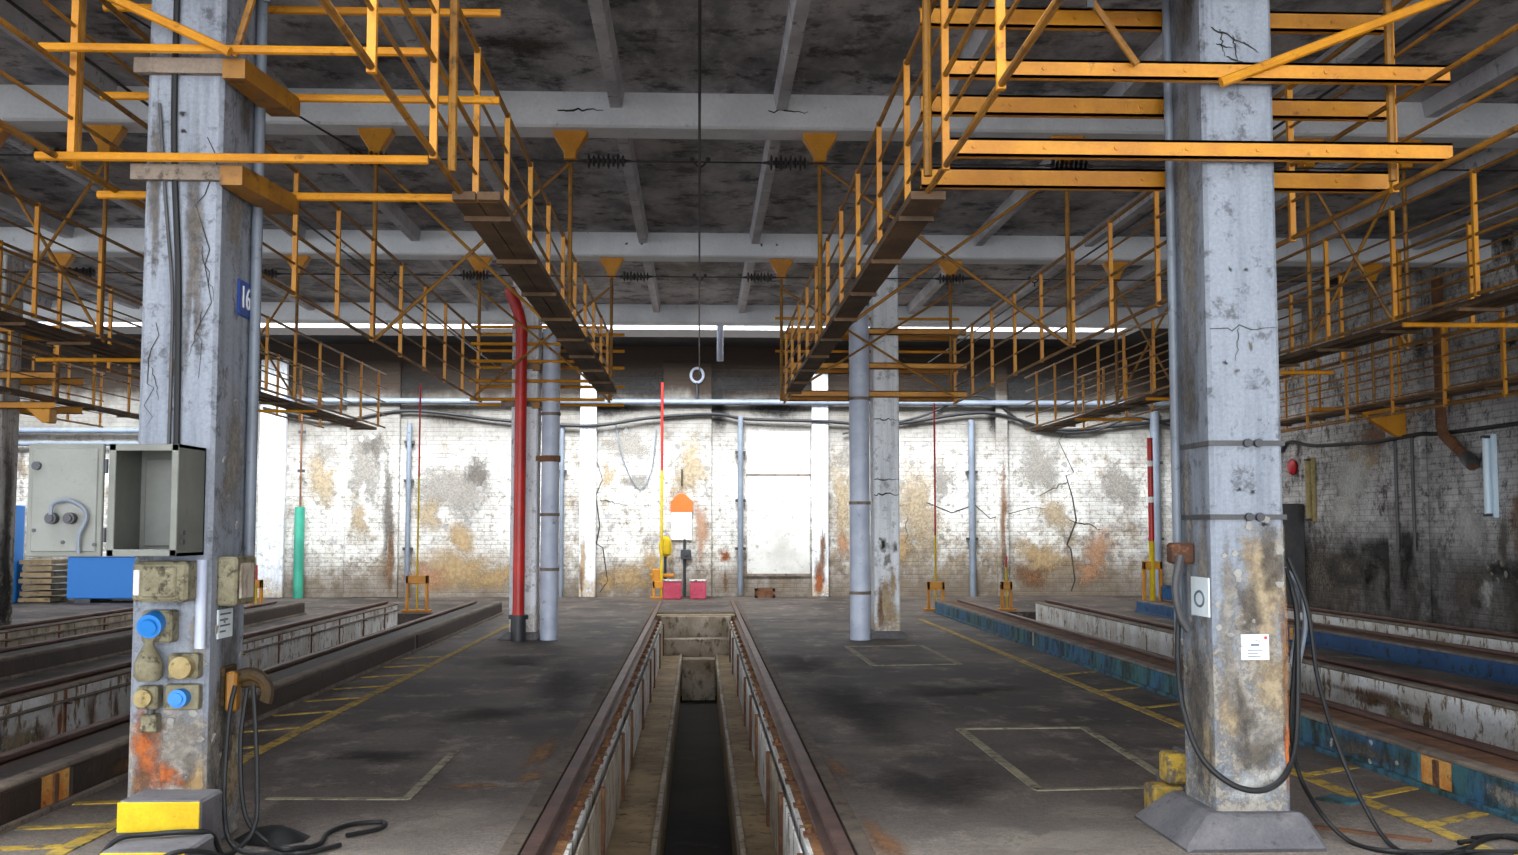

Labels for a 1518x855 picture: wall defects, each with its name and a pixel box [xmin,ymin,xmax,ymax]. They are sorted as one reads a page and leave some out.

crack [1211,27,1257,62]
damp [383,451,394,586]
damp [411,525,510,591]
damp [579,543,656,591]
crack [874,434,1102,591]
damp [1328,542,1411,609]
damp [1450,496,1518,615]
rust [117,719,190,794]